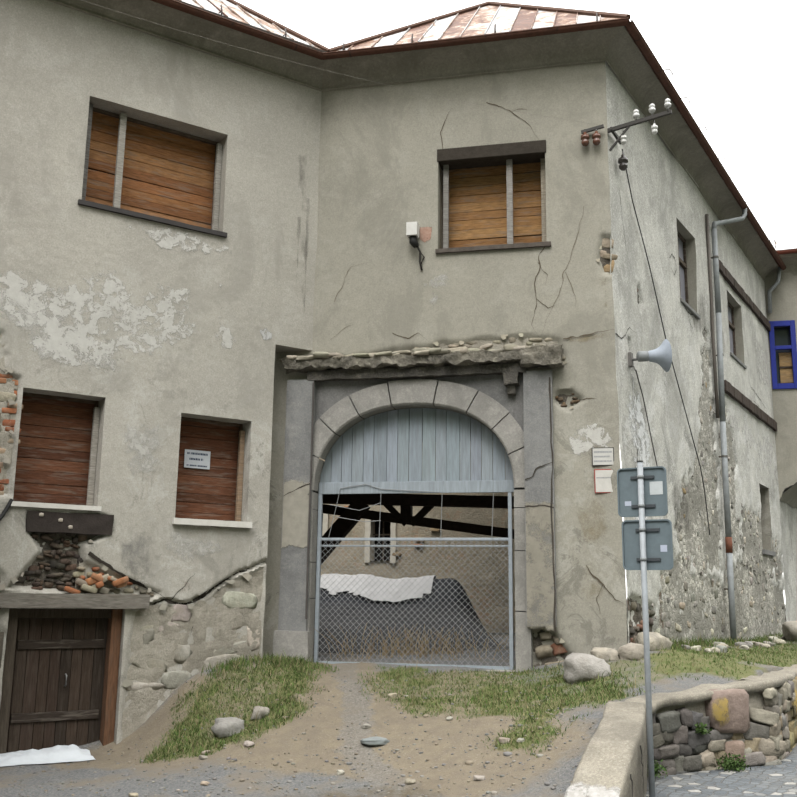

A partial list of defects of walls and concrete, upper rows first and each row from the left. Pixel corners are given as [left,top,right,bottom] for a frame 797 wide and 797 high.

peeling [0,270,195,372]
peeling [145,228,229,254]
crack [531,207,584,335]
crack [563,327,633,339]
flaking render [596,238,618,273]
flaking render [0,333,23,495]
crack [525,377,556,631]
flaking render [555,393,580,409]
peeling [569,423,612,455]
flaking render [626,330,786,644]
flaking render [11,532,264,740]
crack [88,552,265,631]